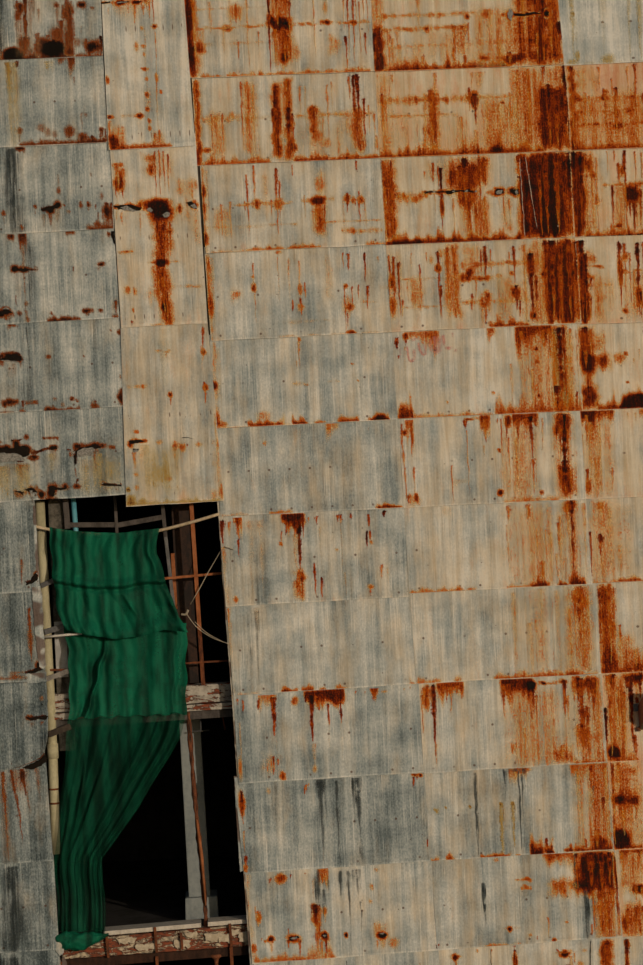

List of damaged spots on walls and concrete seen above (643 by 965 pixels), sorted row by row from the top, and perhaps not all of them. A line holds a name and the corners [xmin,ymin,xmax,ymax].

corrosion [0,0,177,325]
corrosion [126,437,223,506]
corrosion [184,0,643,965]